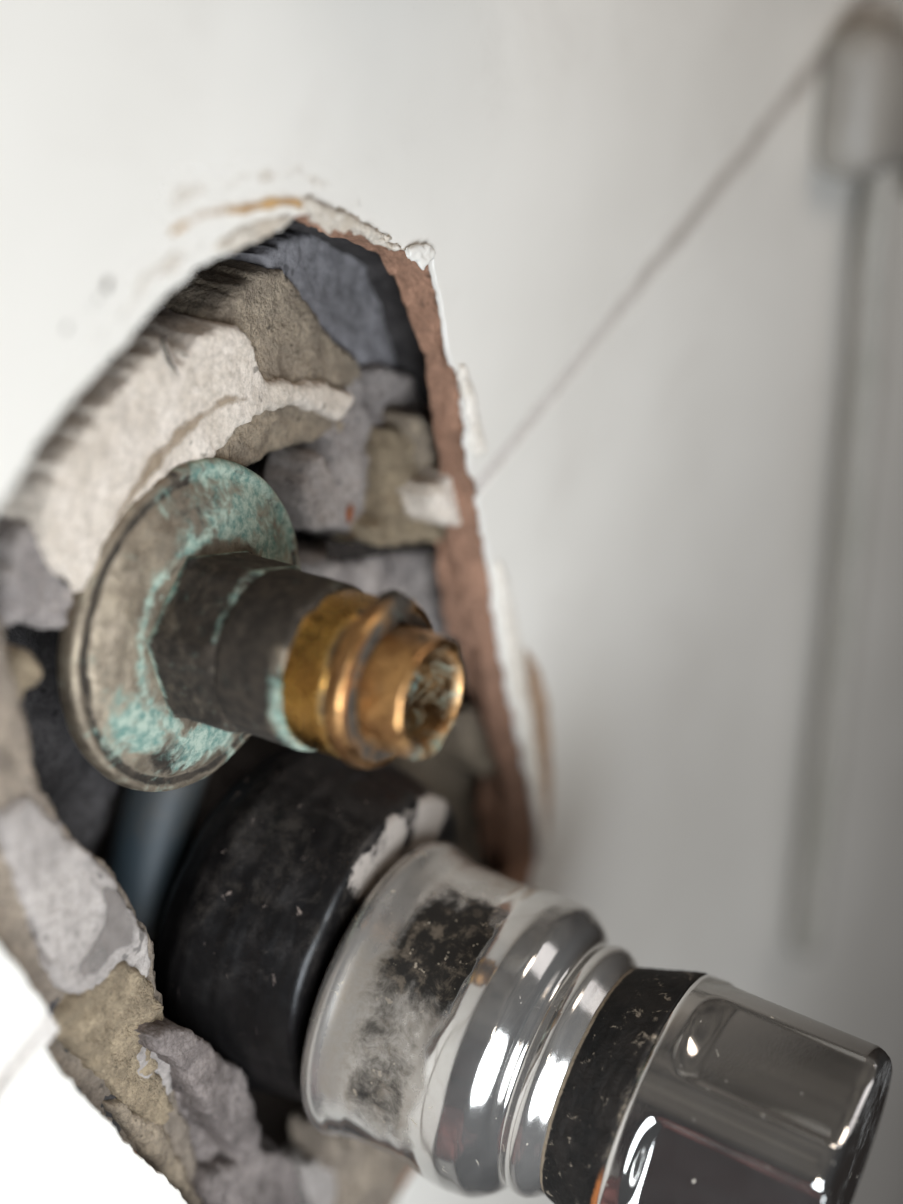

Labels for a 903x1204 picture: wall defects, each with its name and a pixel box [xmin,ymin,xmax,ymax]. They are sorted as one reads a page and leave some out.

spalling [0,194,552,1204]